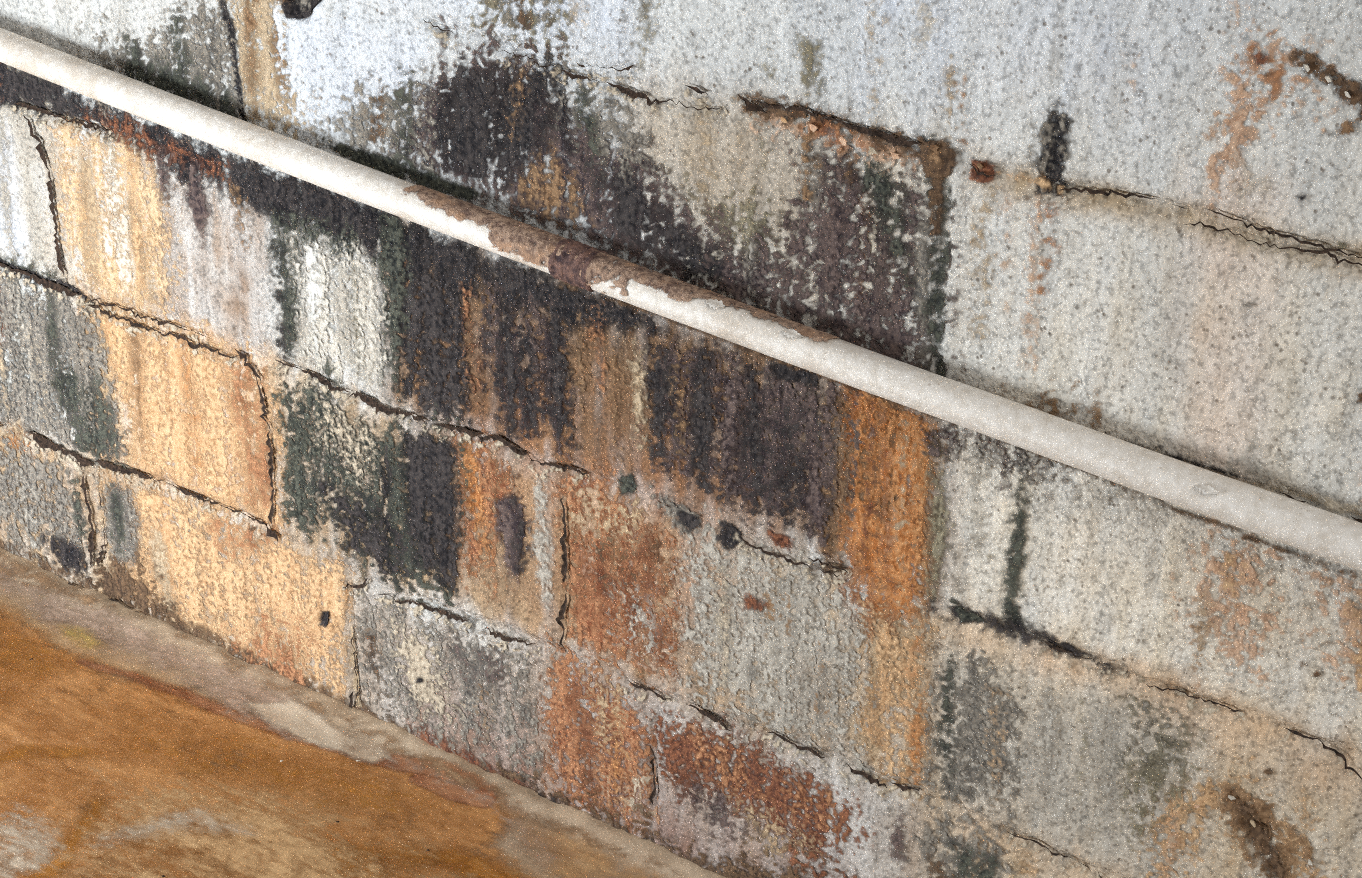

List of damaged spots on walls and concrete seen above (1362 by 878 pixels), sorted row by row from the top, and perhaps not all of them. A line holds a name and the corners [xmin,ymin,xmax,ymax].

water stain [74,0,960,377]
crack [1059,187,1362,276]
corrosion [1205,29,1343,210]
water stain [0,62,875,878]
corrosion [0,116,875,878]
corrosion [828,382,946,806]